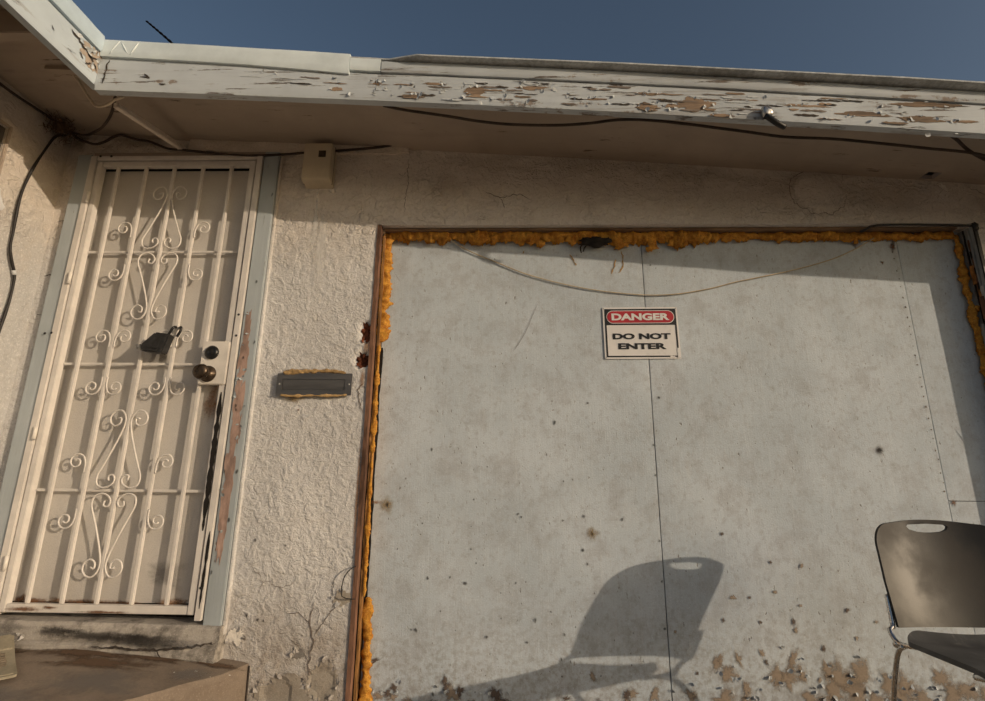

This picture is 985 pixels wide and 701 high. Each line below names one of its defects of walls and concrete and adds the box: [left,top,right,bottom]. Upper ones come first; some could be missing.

peeling [76,33,102,73]
peeling [247,69,351,96]
peeling [370,79,978,137]
peeling [211,309,255,574]
crack [252,567,341,697]
crack [243,666,251,701]
peeling [373,679,412,701]
peeling [432,675,509,701]
peeling [650,672,699,701]
peeling [712,645,985,701]